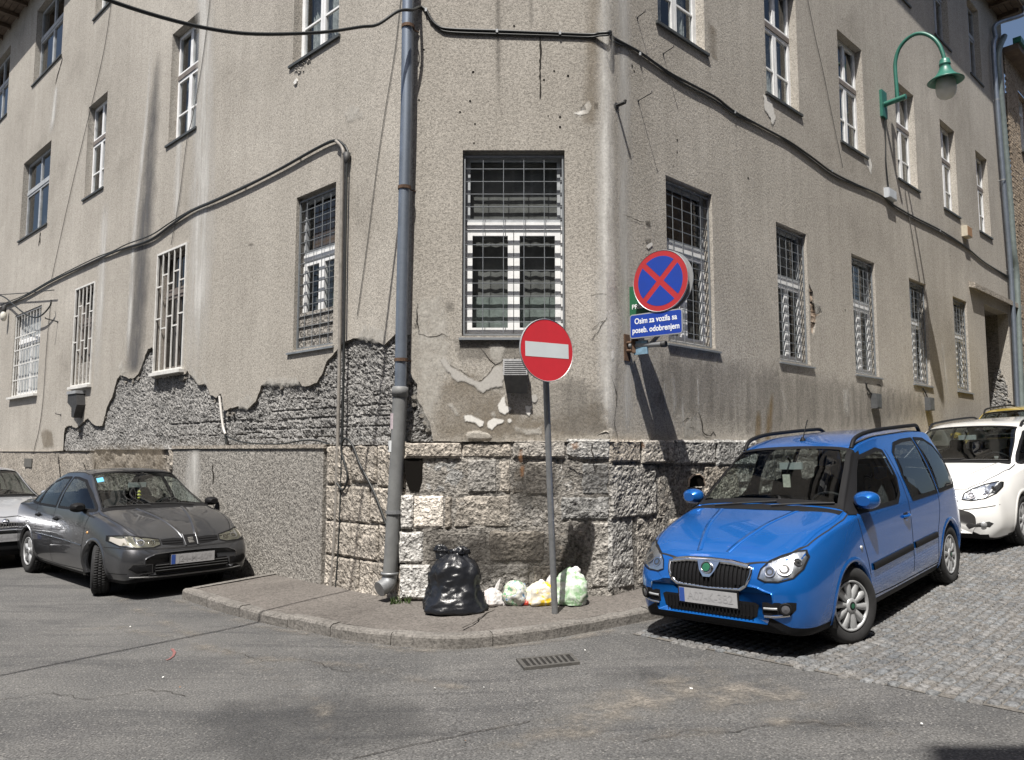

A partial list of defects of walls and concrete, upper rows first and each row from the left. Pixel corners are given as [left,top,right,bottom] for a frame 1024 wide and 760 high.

crack [536,37,544,98]
damp [128,99,156,368]
spalling [809,288,819,334]
spalling [45,306,451,452]
peeling [439,345,541,434]